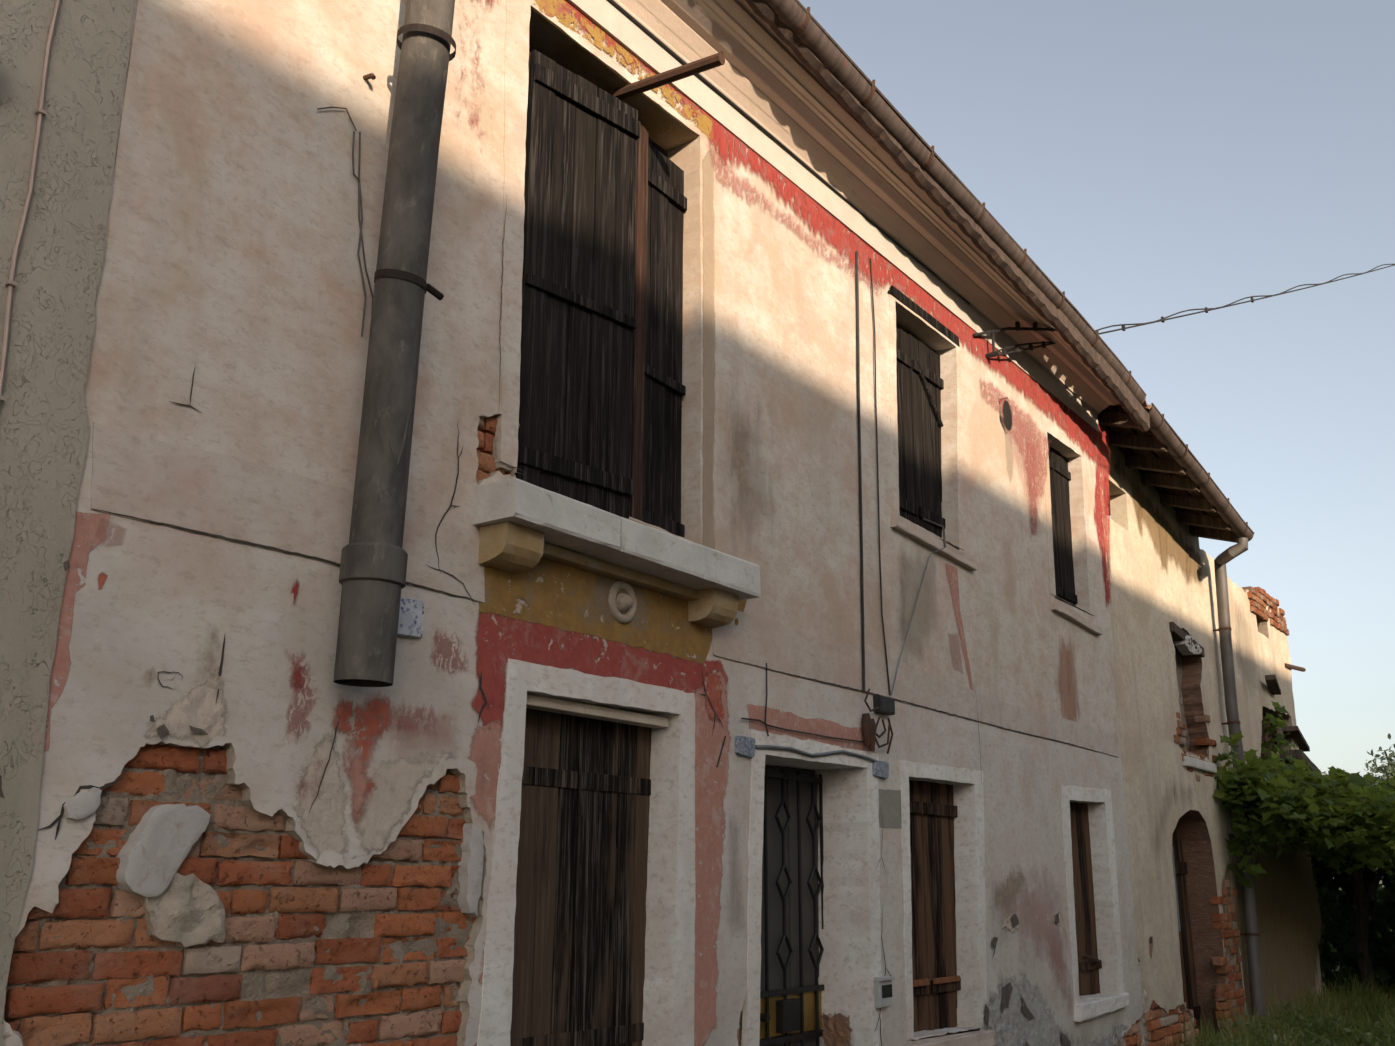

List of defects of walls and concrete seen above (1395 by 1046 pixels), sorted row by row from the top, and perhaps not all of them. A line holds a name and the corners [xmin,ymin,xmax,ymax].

peeling [533,0,1111,606]
spalling [476,416,512,483]
spalling [1174,635,1202,655]
spalling [1241,586,1289,636]
spalling [1174,697,1218,782]
spalling [3,557,731,1046]
spalling [1210,880,1248,1042]
spalling [984,977,1199,1046]